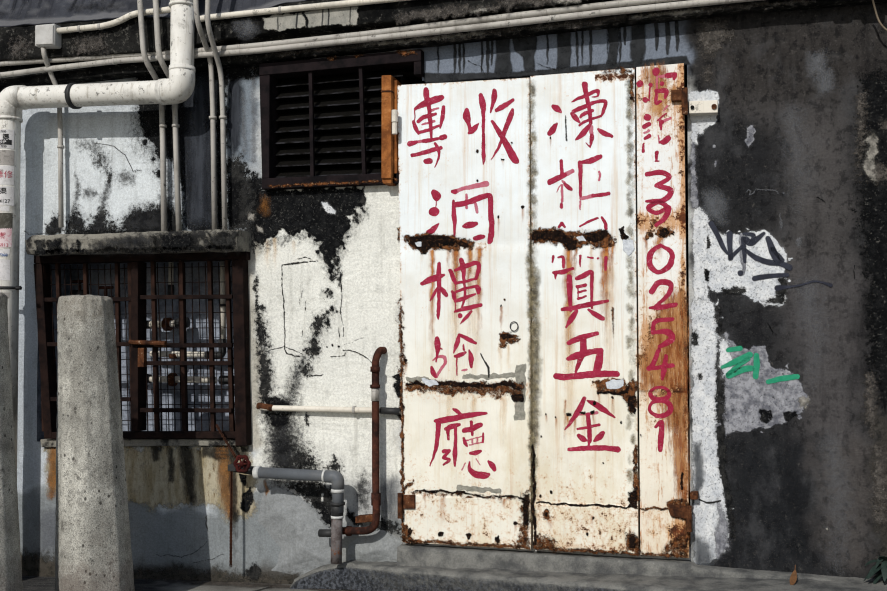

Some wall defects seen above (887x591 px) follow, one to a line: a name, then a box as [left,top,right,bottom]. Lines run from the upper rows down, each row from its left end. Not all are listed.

damp [33,0,816,257]
rust [600,64,675,118]
damp [252,266,344,476]
damp [270,479,332,528]
rust [395,226,691,559]
peeling [688,17,810,566]
damp [851,66,887,533]